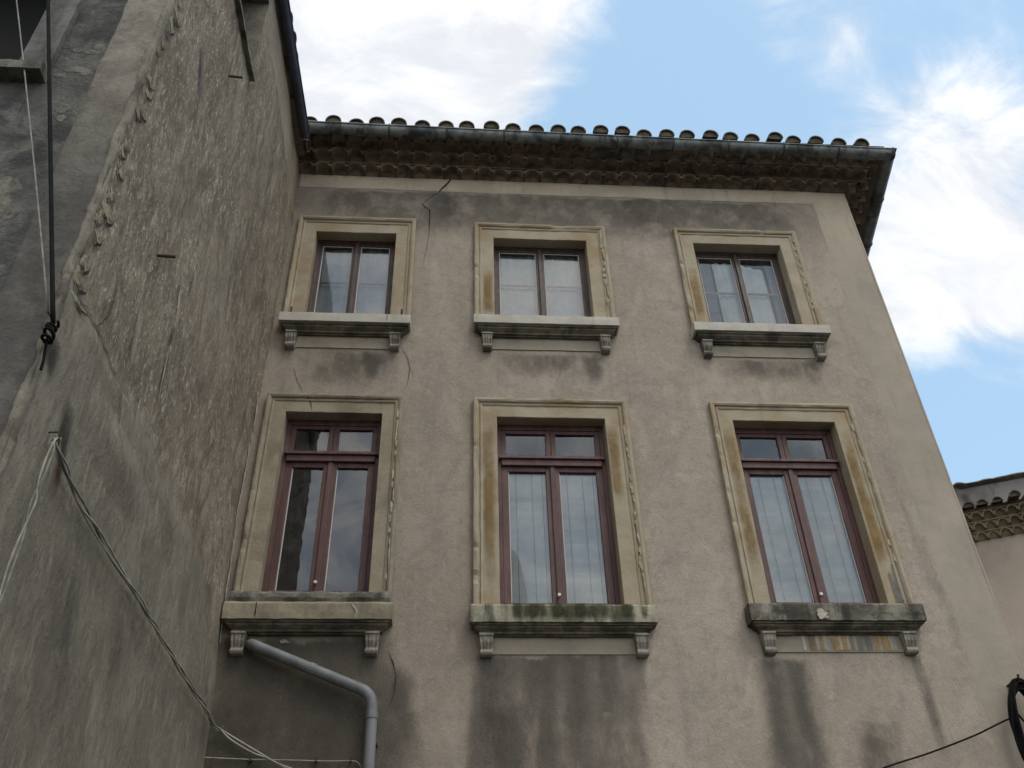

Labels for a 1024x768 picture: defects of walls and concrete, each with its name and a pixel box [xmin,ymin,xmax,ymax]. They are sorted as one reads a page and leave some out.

crack [422,179,451,263]
damp [514,603,538,616]
crack [384,652,397,715]